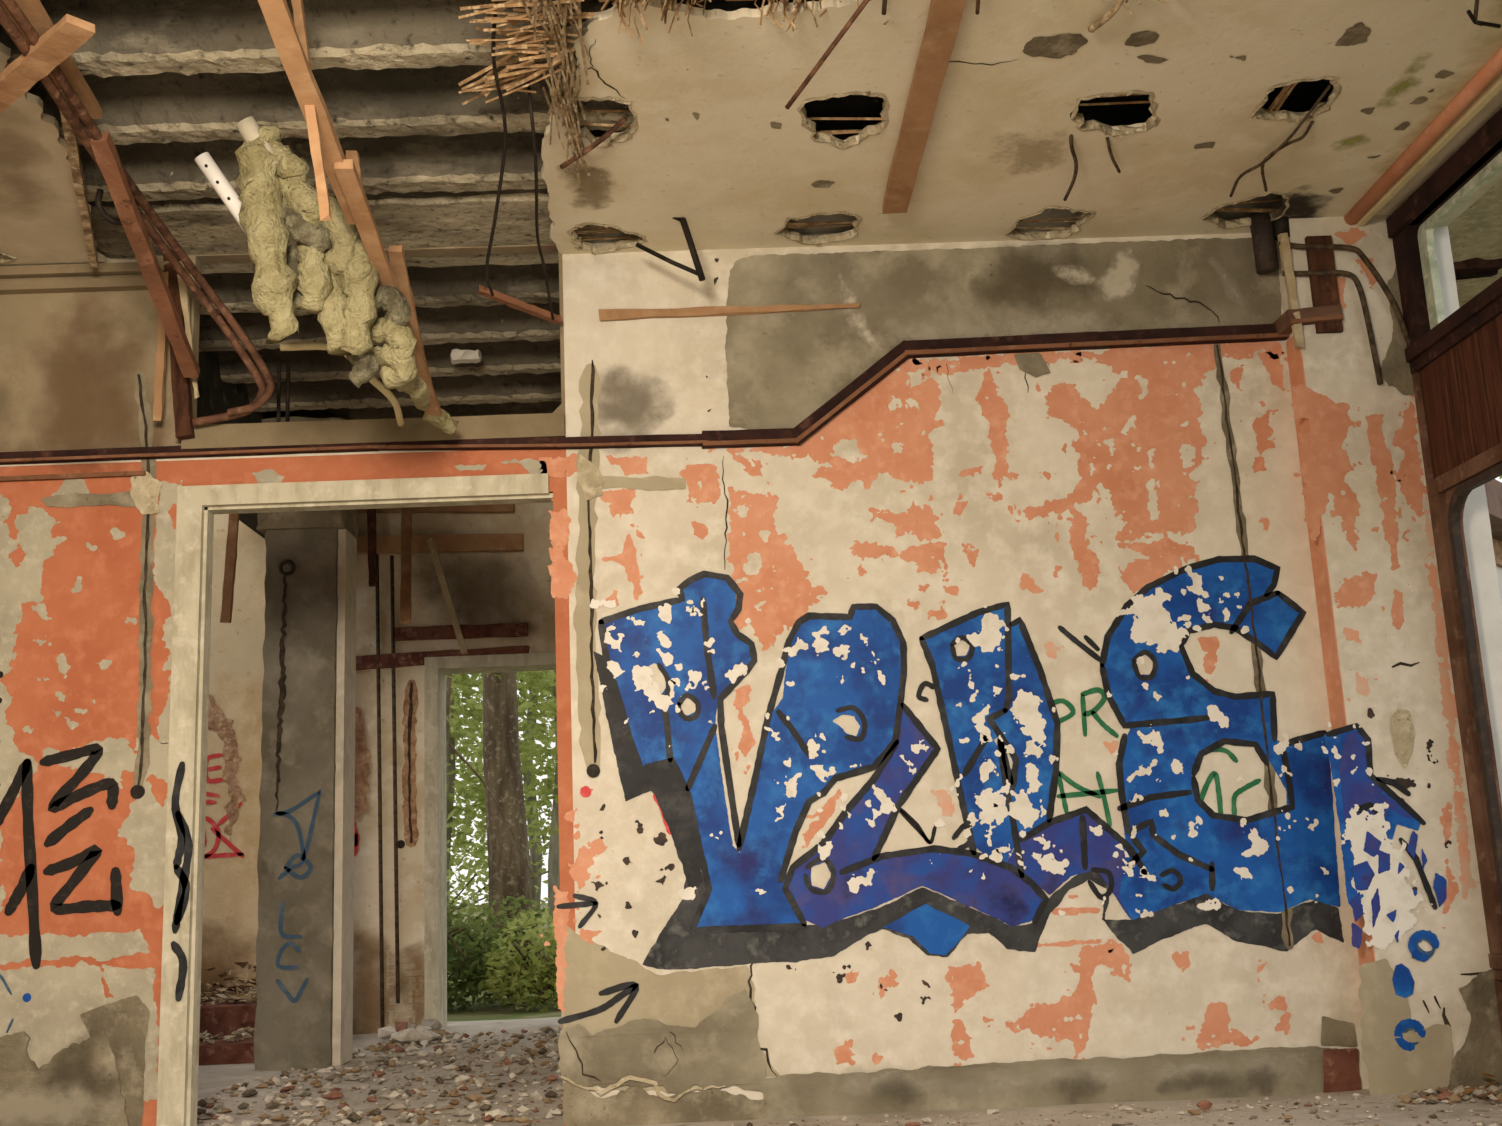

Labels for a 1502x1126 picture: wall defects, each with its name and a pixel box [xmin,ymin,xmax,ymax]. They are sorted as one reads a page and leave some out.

spalling [549,24,588,97]
damp [846,296,875,342]
damp [903,251,1139,340]
peeling [252,469,284,483]
peeling [0,472,183,908]
spalling [455,227,1502,1126]